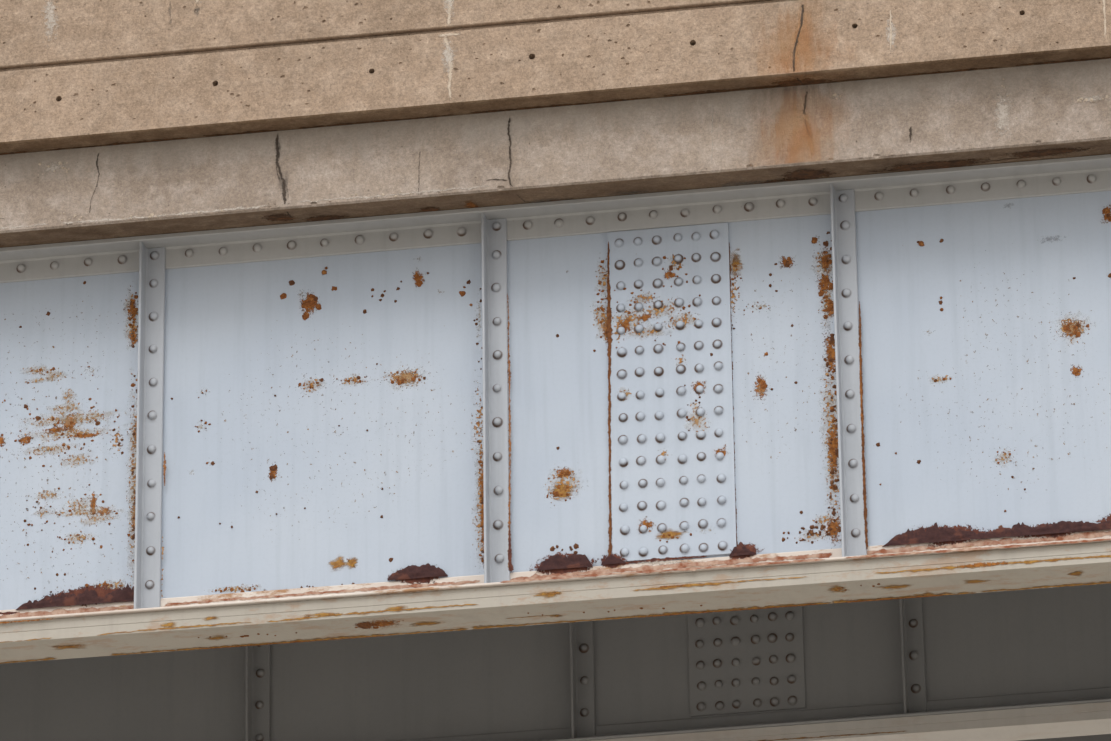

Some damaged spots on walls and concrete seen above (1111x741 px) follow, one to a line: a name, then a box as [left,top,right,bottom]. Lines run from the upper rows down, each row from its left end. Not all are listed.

crack [793,4,810,136]
crack [275,135,291,217]
crack [490,118,525,202]
rust [1100,205,1111,223]
rust [363,258,429,314]
rust [0,316,137,593]
rust [100,280,1111,656]
rust [501,231,841,597]
rust [0,605,134,624]